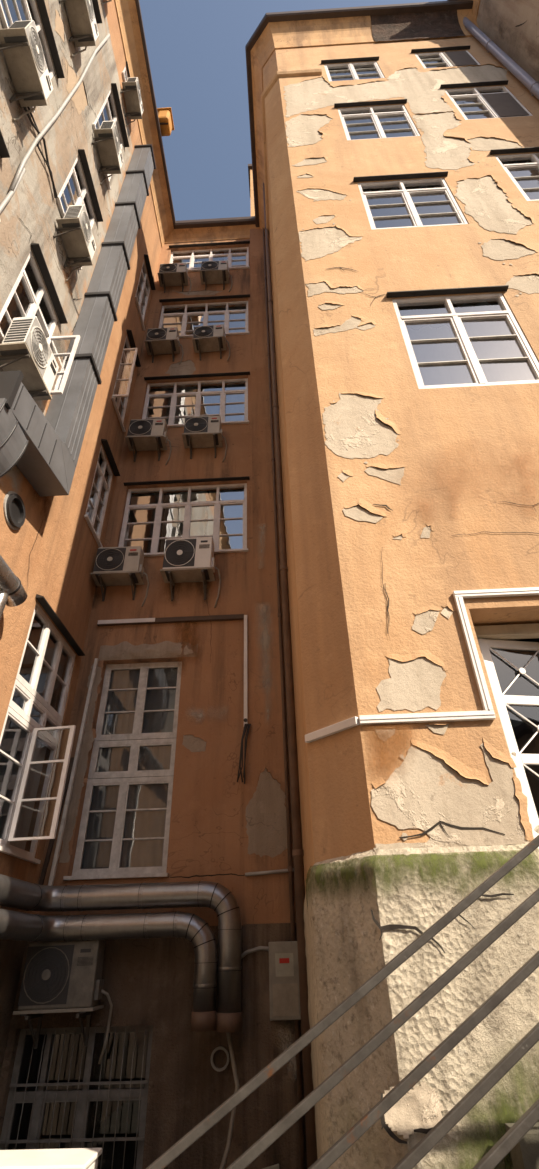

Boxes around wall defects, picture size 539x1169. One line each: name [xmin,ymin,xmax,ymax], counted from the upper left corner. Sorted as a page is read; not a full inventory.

flaking render [283,64,539,297]
flaking render [323,391,406,485]
crack [381,552,390,635]
flaking render [412,599,457,634]
flaking render [371,650,539,850]
crack [371,910,445,953]
crack [482,891,514,899]